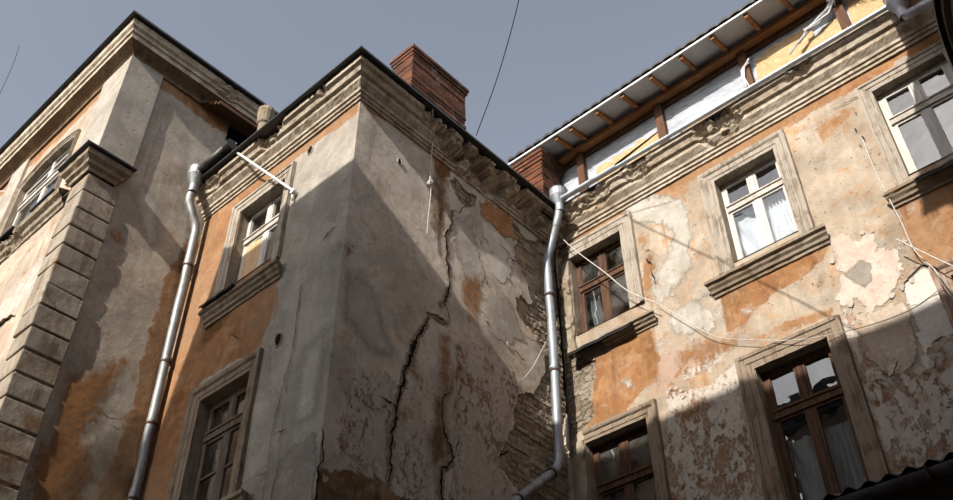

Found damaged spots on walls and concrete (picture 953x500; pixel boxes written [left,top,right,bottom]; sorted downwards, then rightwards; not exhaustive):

damp [28,358,125,500]
crack [364,172,471,500]
flaking render [450,179,570,500]
flaking render [625,193,695,307]
peeling [664,378,763,500]
peeling [829,229,953,474]